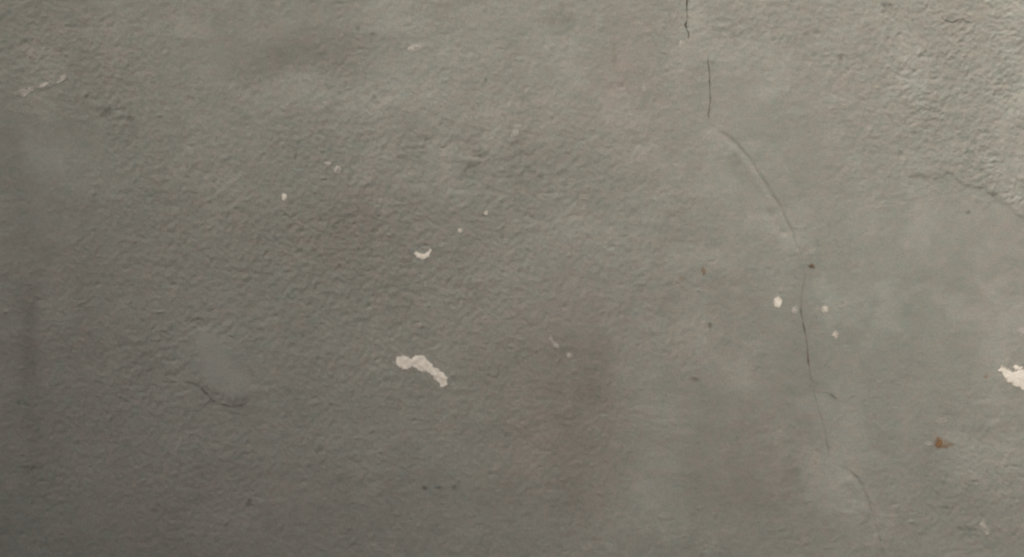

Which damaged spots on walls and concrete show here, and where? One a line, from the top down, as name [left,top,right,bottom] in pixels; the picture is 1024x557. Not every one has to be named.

spalling [396,355,448,387]
spalling [998,365,1024,390]